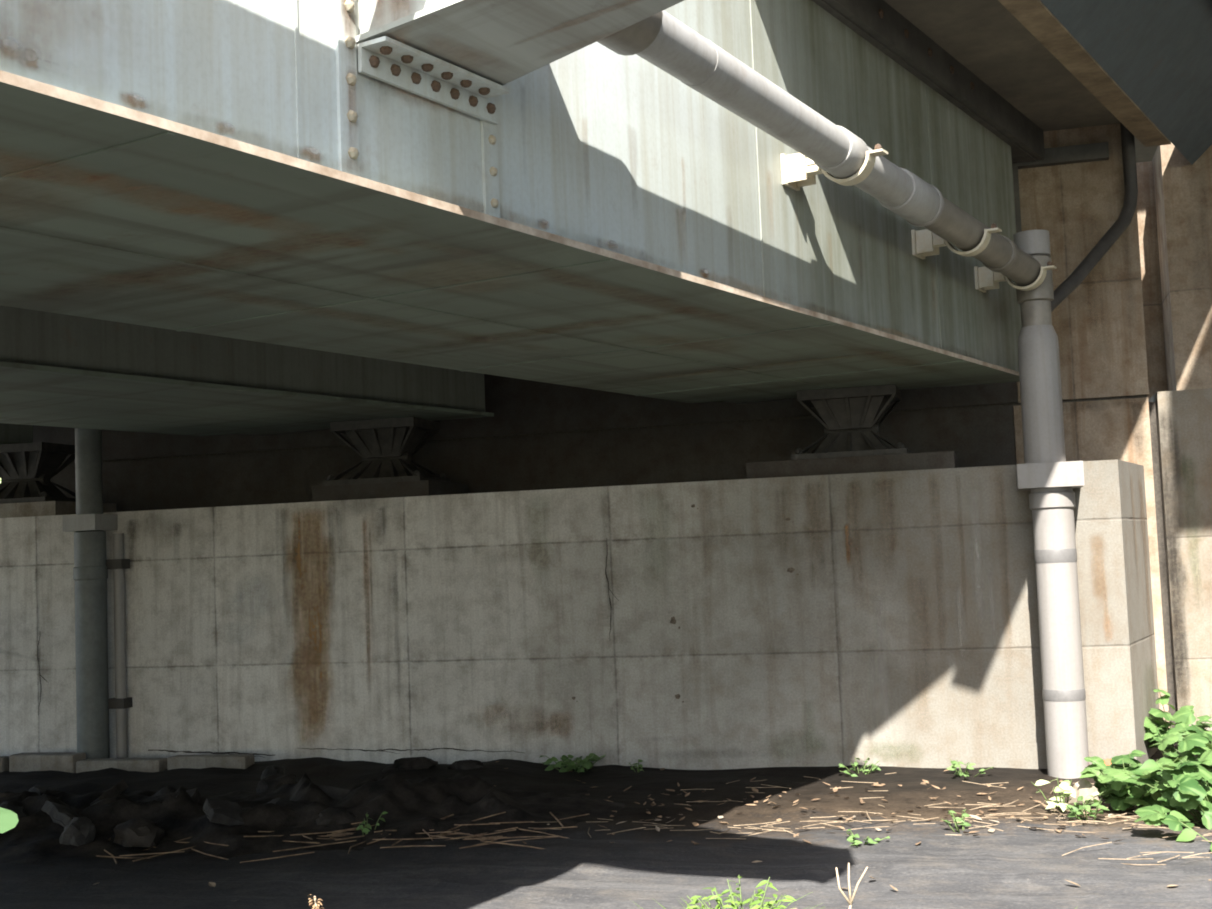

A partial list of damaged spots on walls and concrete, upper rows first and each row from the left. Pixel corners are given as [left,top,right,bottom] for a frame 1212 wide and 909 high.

water stain [1164,471,1179,584]